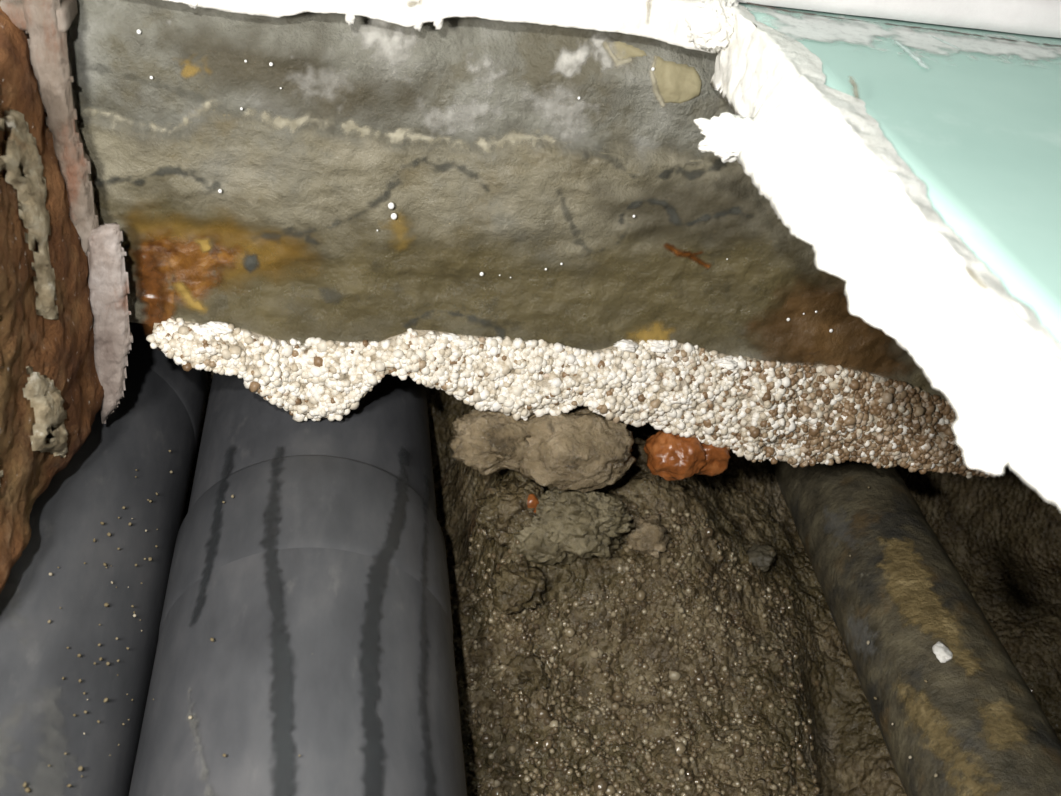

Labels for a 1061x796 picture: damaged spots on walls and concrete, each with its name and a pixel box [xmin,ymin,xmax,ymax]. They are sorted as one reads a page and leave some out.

crack [95,167,219,189]
crack [372,183,395,206]
crack [413,160,486,188]
crack [620,159,749,226]
rust [131,222,301,334]
spalling [68,0,1061,511]